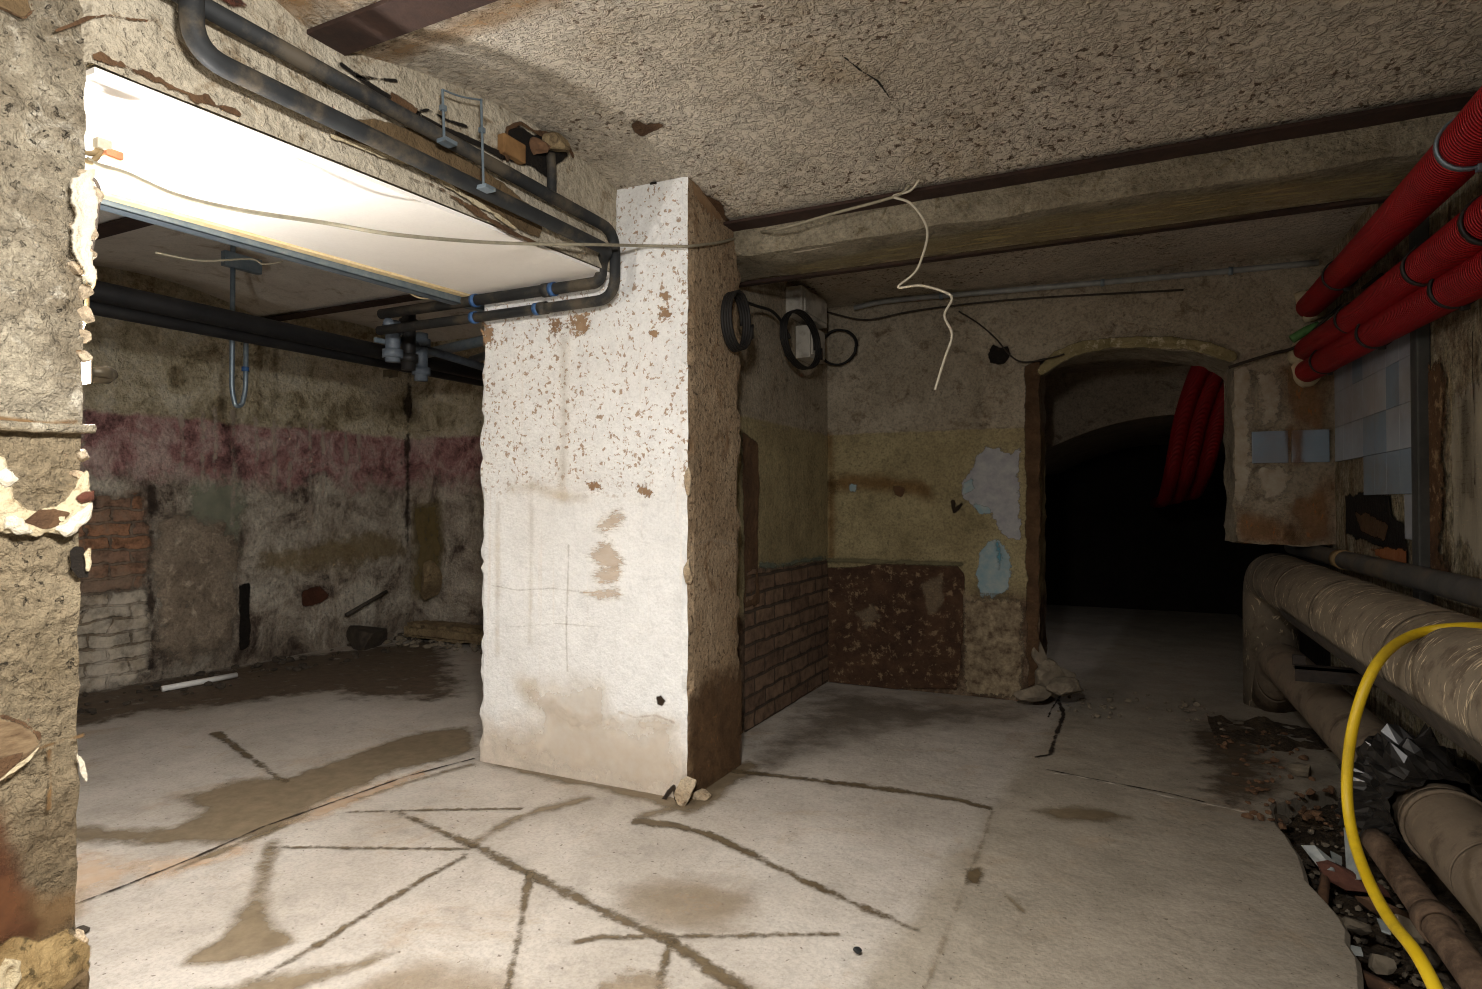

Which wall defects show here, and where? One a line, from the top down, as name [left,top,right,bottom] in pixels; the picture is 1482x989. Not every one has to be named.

flaking render [0,456,154,694]
spalling [742,336,1293,732]
spalling [1345,492,1407,563]
spalling [0,929,91,989]
damp [76,727,473,963]
crack [76,731,918,989]
crack [732,769,992,810]
crack [1035,696,1245,812]